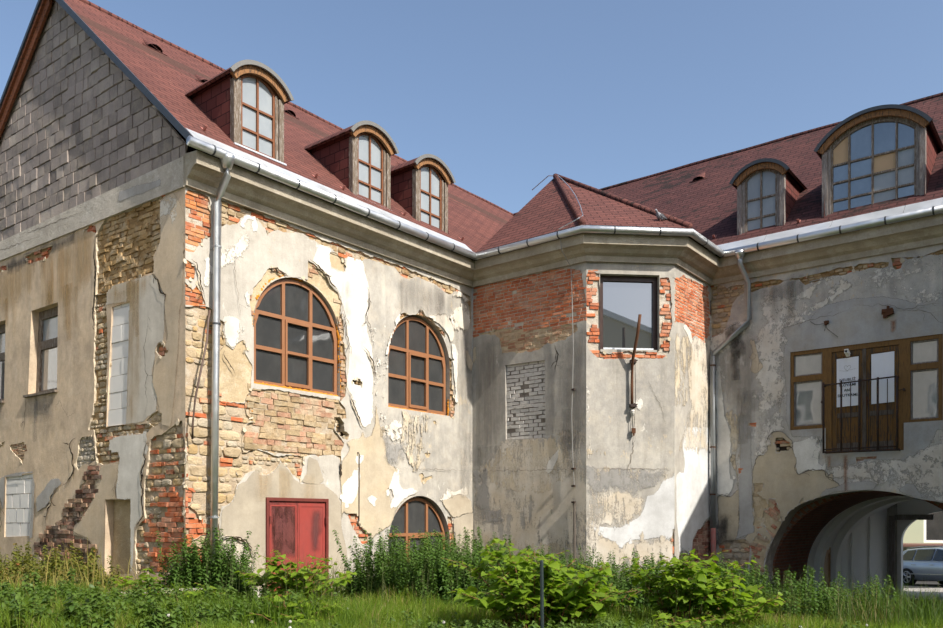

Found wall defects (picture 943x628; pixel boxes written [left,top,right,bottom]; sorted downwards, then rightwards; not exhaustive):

leakage [472,468,503,524]
flaking render [34,190,943,589]